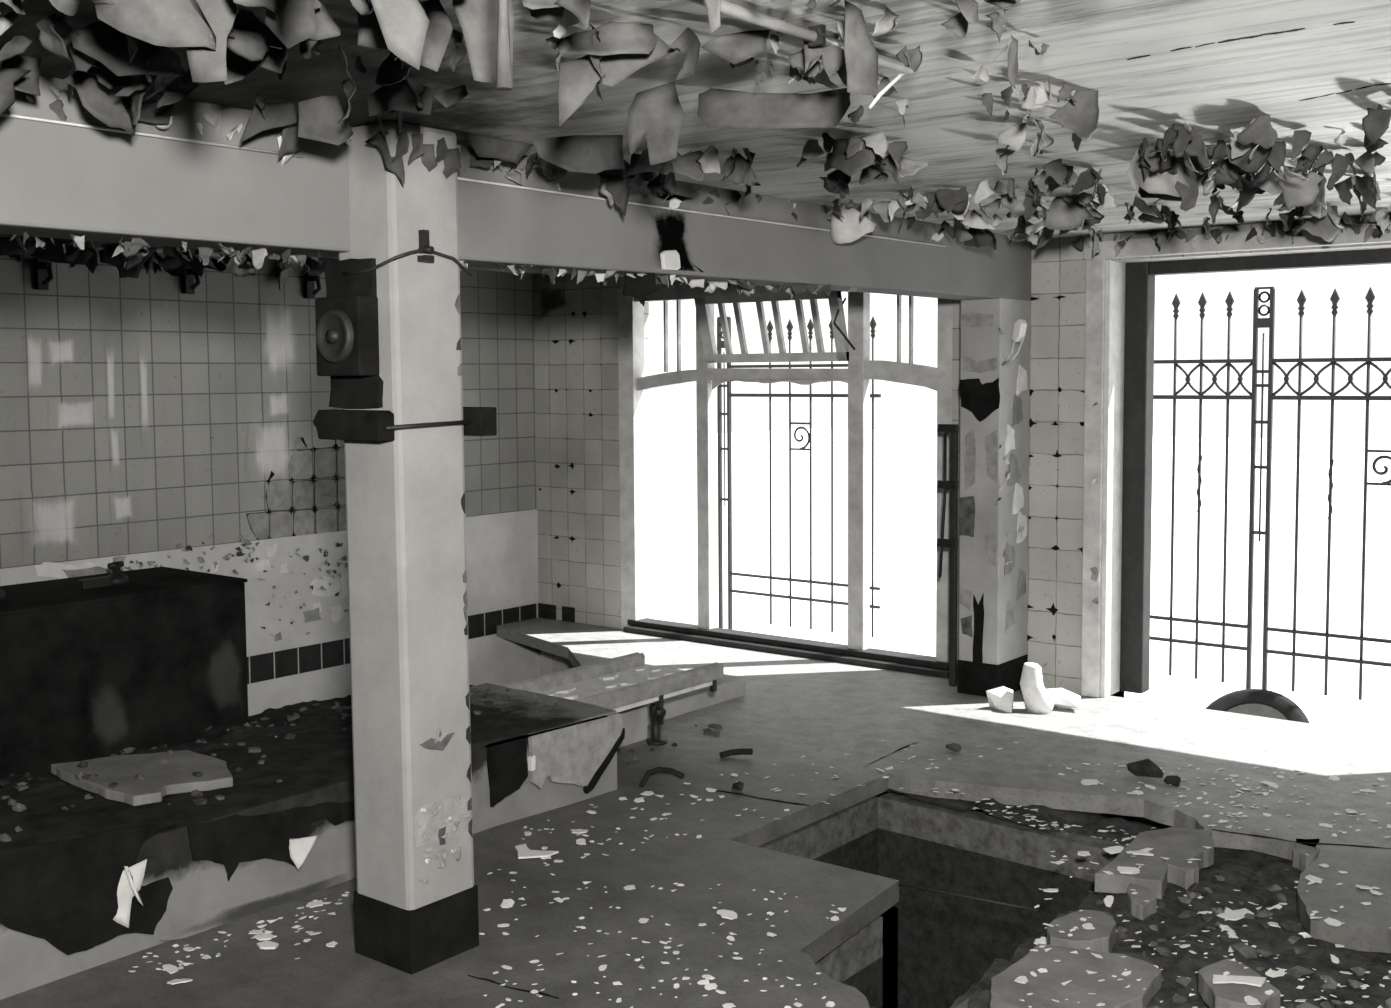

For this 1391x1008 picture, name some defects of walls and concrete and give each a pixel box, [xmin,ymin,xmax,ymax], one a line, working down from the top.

peeling [0,0,1391,259]
peeling [0,231,330,291]
peeling [491,264,830,299]
spalling [34,437,349,641]
flaking render [959,355,1027,637]
spalling [415,692,625,884]
spalling [759,792,1127,1008]